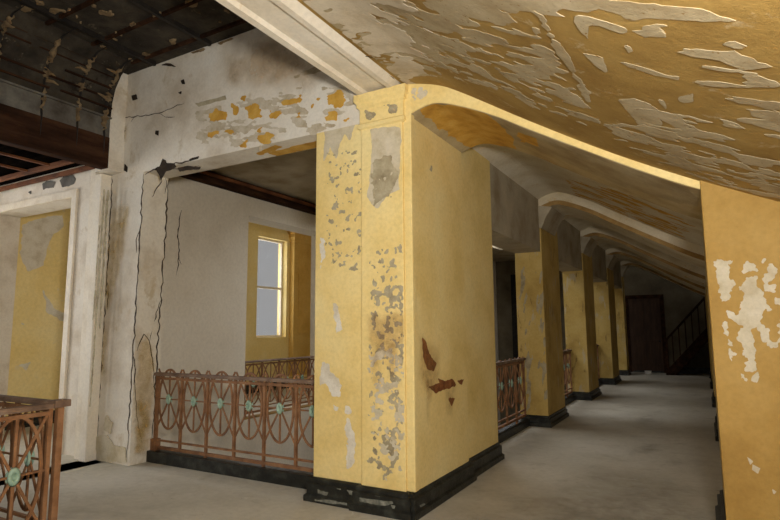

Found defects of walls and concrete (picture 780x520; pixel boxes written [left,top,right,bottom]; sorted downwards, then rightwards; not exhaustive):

flaking render [152,156,201,179]
peeling [195,67,402,271]
peeling [302,0,780,240]
peeling [319,362,356,469]
peeling [367,244,405,481]
peeling [422,338,464,406]
peeling [519,267,547,411]
peeling [703,233,780,481]